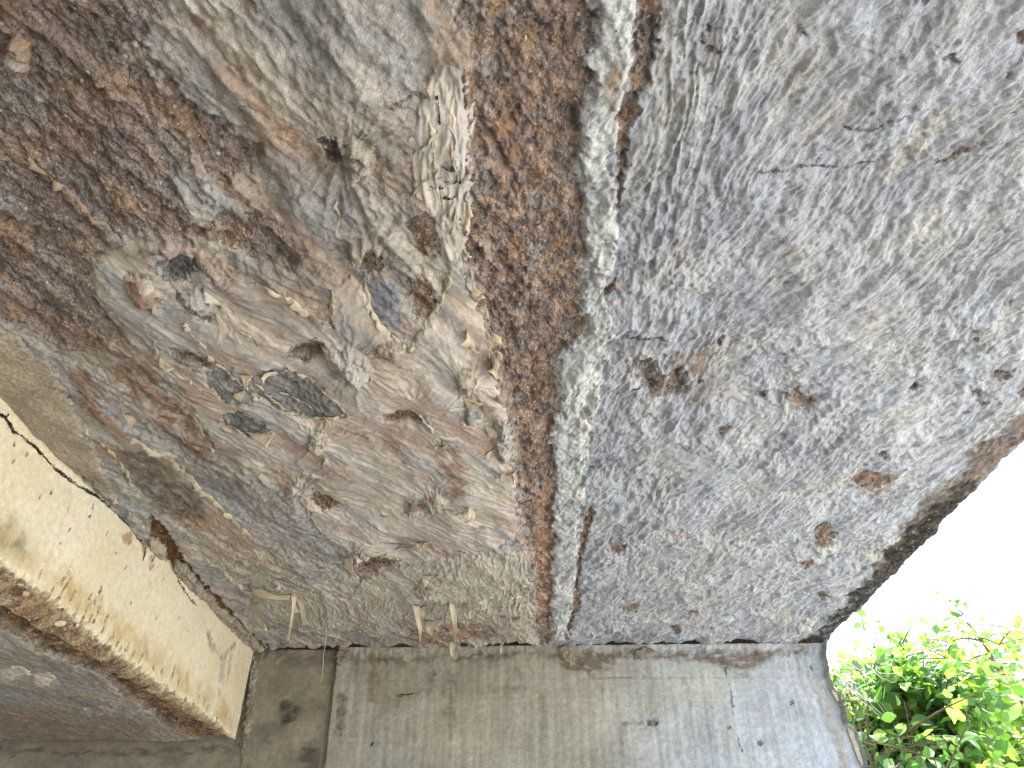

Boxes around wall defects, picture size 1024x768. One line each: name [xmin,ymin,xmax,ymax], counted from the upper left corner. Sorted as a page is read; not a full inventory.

peeling [0,0,600,681]
spalling [631,357,702,418]
crack [0,411,198,606]
corrosion [536,488,552,612]
spalling [798,521,838,569]
spalling [848,451,894,488]
damp [874,415,1024,580]